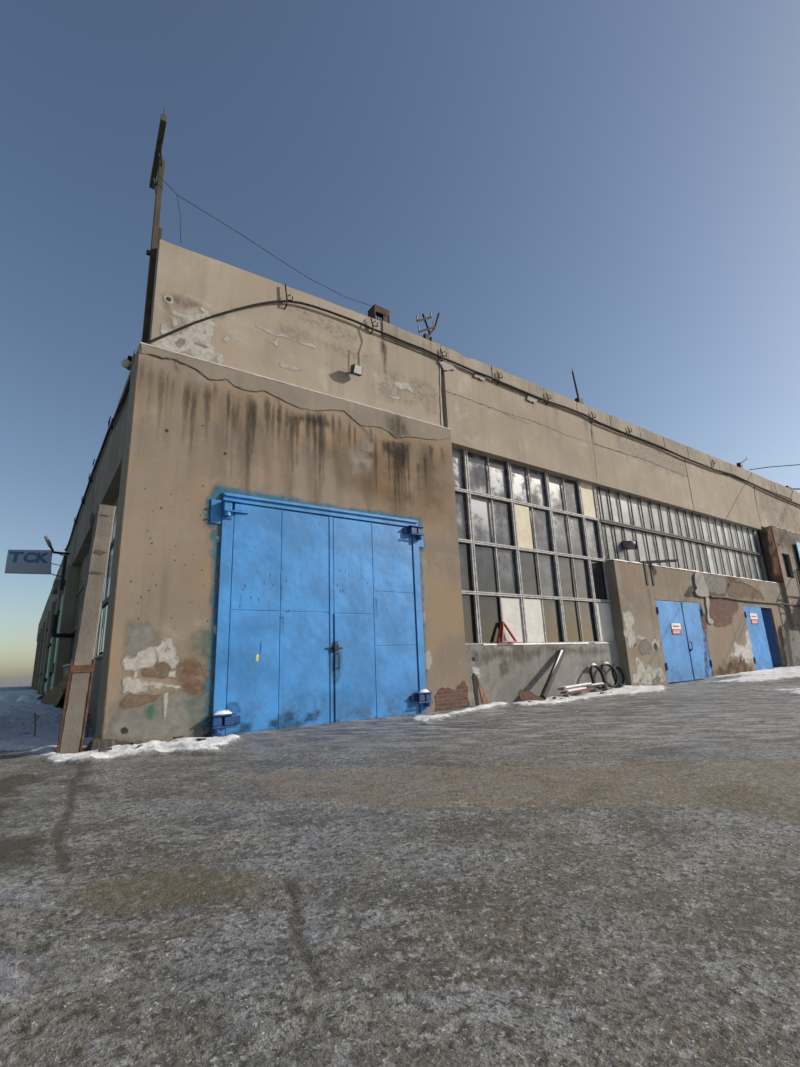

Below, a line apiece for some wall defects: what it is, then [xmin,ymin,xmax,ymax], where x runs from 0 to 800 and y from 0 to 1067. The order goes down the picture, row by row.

crack [150,354,425,439]
flaking render [131,307,451,440]
flaking render [684,574,764,631]
flaking render [108,617,212,745]
flaking render [434,667,481,712]
flaking render [623,610,665,686]
flaking render [718,631,753,675]